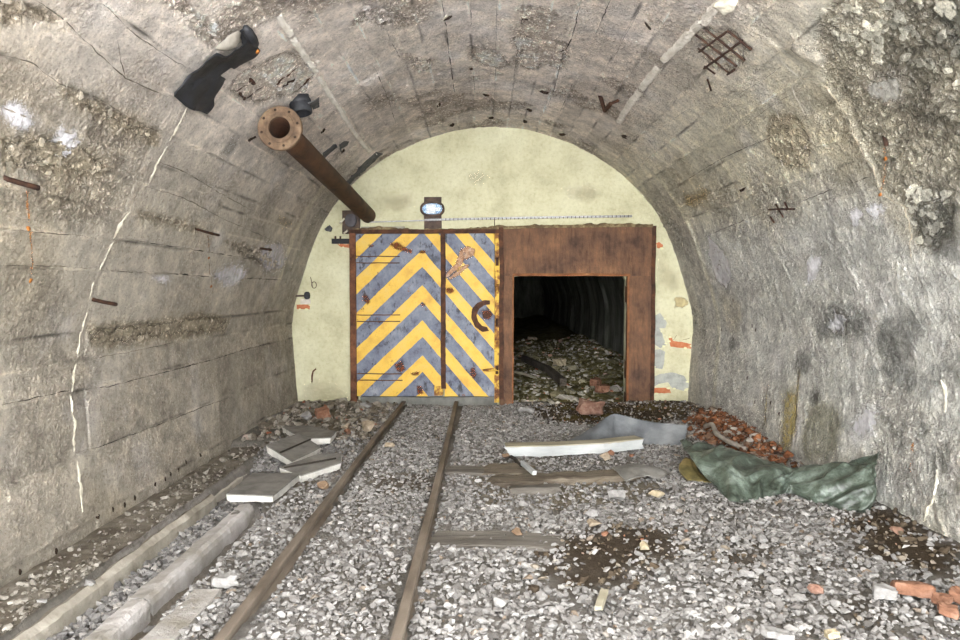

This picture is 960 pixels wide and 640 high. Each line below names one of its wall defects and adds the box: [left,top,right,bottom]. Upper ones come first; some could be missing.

spalling [228,52,321,110]
spalling [684,28,757,92]
spalling [813,0,960,87]
spalling [4,134,108,180]
spalling [78,91,150,138]
spalling [768,112,814,165]
spalling [822,84,952,262]